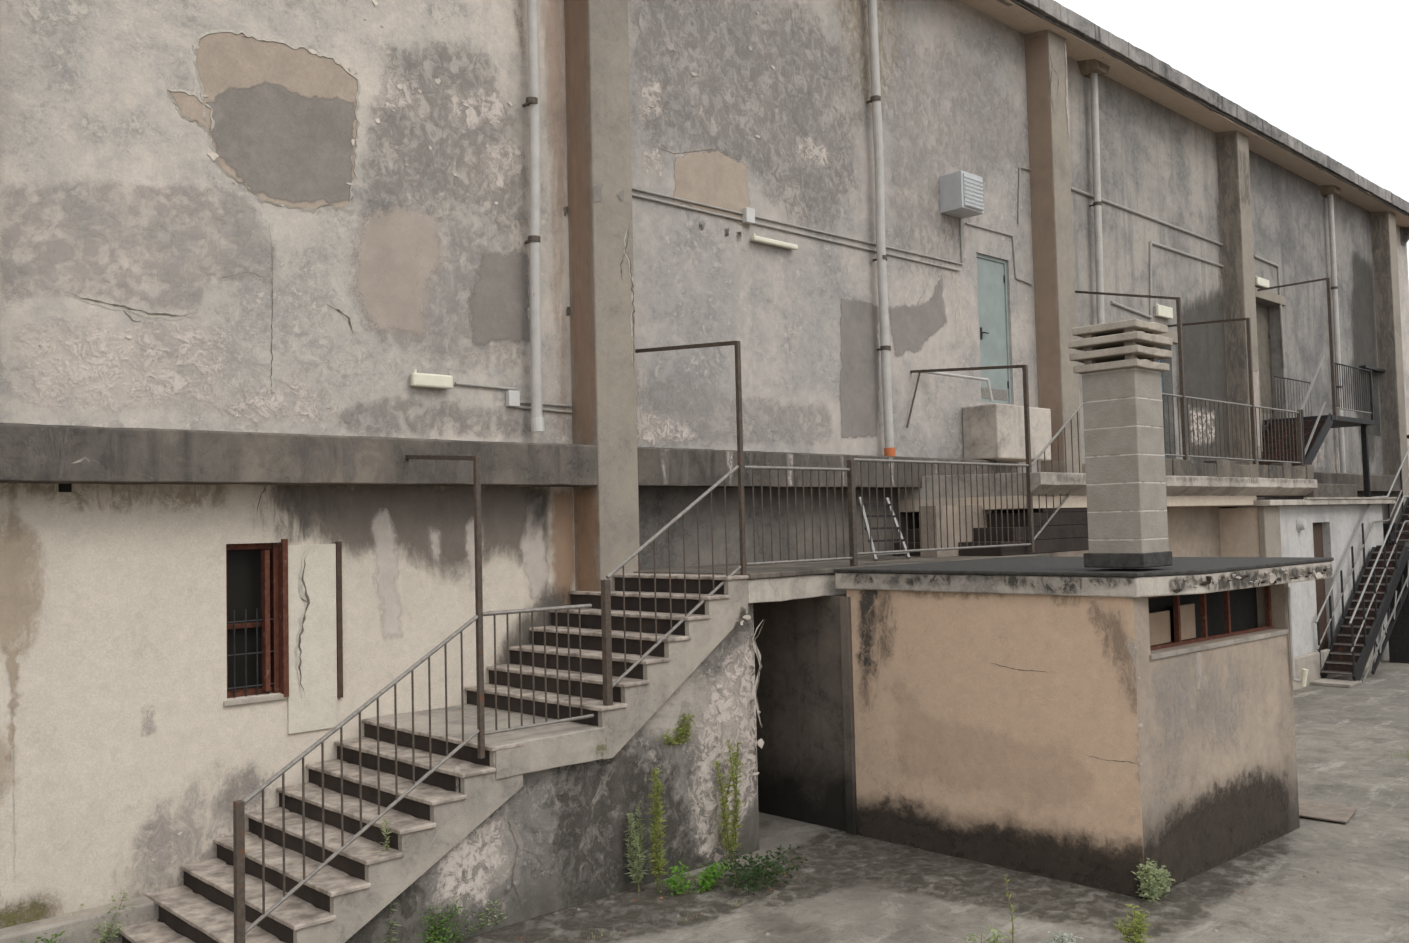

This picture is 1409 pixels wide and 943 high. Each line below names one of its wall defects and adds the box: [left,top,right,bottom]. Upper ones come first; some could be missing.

spalling [167,28,361,214]
water stain [221,370,530,437]
water stain [0,520,40,760]
crack [294,551,310,698]
water stain [276,450,549,637]
water stain [857,773,1290,899]